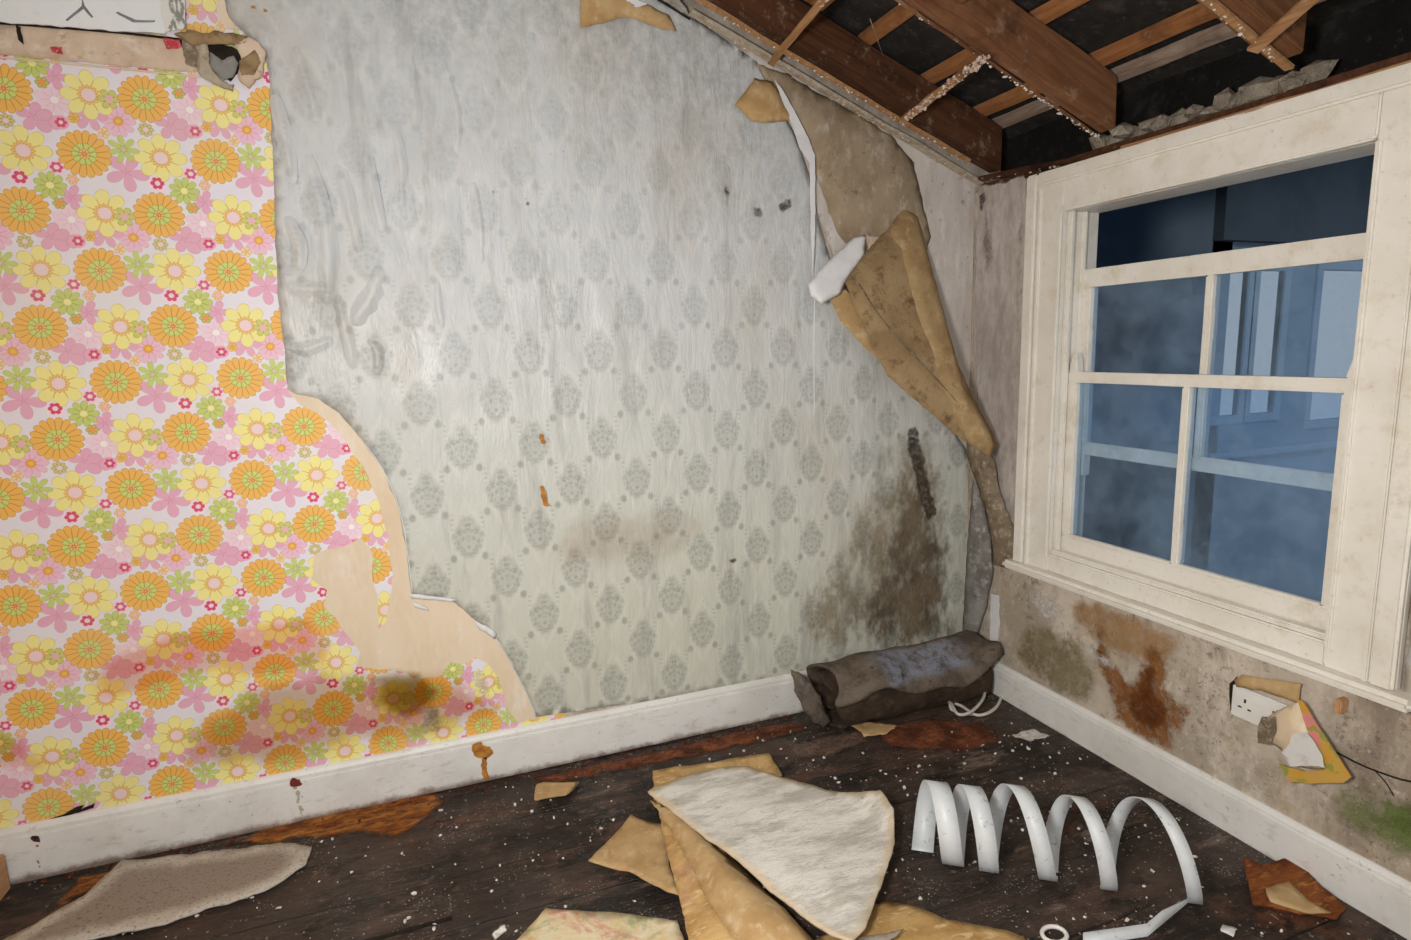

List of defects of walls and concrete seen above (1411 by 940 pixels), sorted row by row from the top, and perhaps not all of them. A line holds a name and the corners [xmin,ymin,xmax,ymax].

spalling [0,22,266,92]
peeling [288,391,539,722]
peeling [735,49,997,457]
leakage [816,177,1027,642]
rust [1097,634,1188,747]